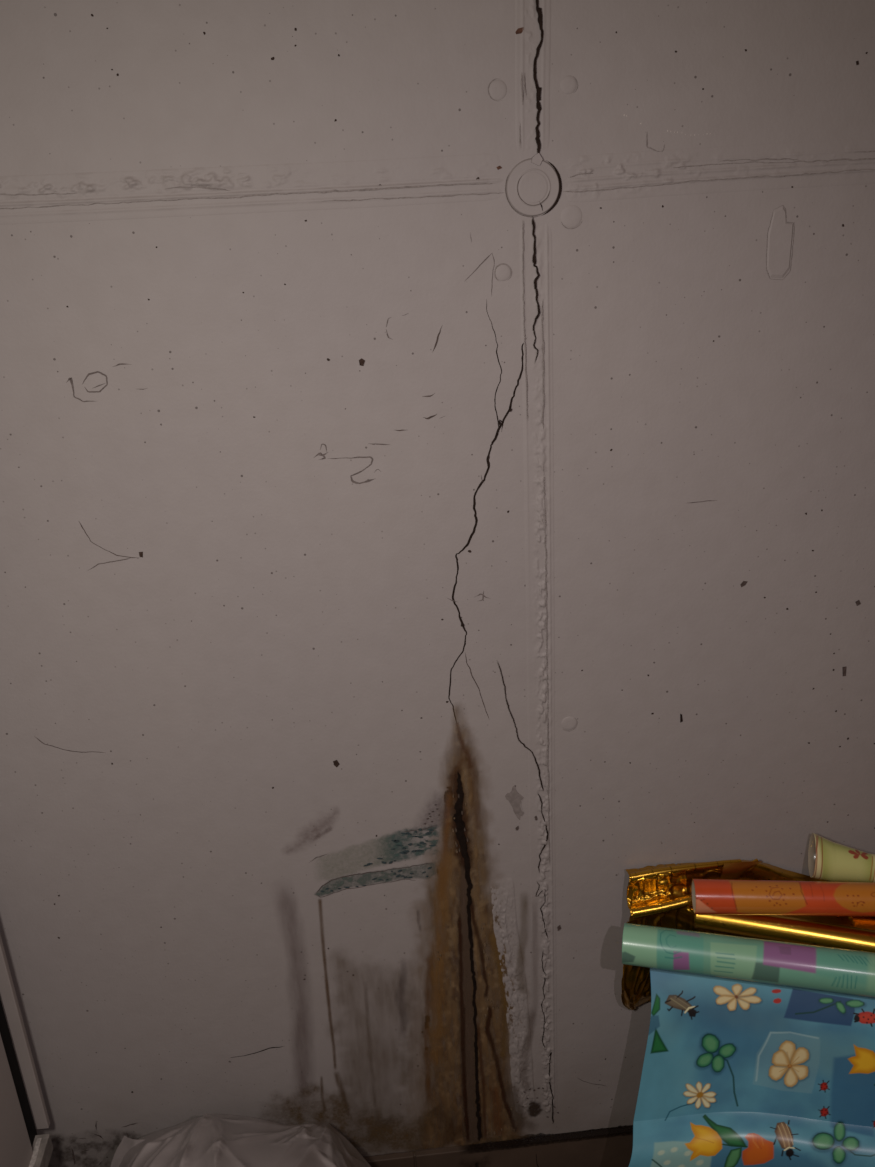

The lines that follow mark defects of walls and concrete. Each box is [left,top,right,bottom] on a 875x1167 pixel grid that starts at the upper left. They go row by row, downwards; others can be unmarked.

crack [533,0,543,153]
crack [448,201,554,1141]
leakage [286,936,419,1152]
rust [422,730,519,1150]